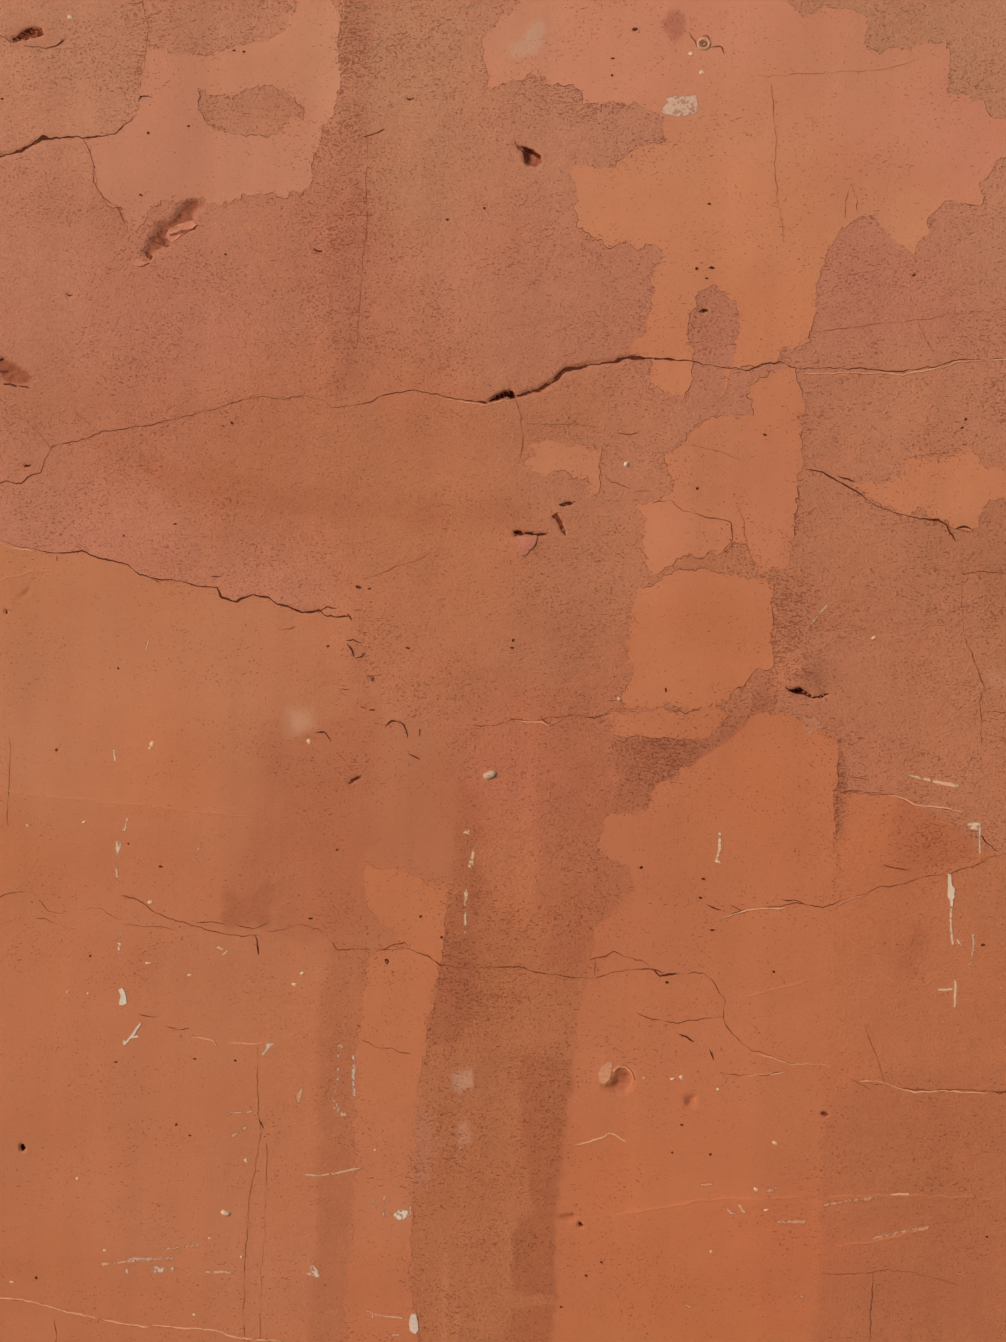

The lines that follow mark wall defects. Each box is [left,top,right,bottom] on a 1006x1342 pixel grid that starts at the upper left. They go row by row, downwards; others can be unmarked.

crack [0,0,152,227]
peeling [86,0,342,266]
crack [0,309,1006,484]
crack [605,476,754,564]
peeling [481,0,1006,981]
crack [805,469,972,541]
crack [0,1014,282,1342]
peeling [302,865,585,1342]
damp [424,771,494,1096]
crack [0,892,1006,1094]
damp [501,1050,578,1342]
peeling [598,1062,613,1084]